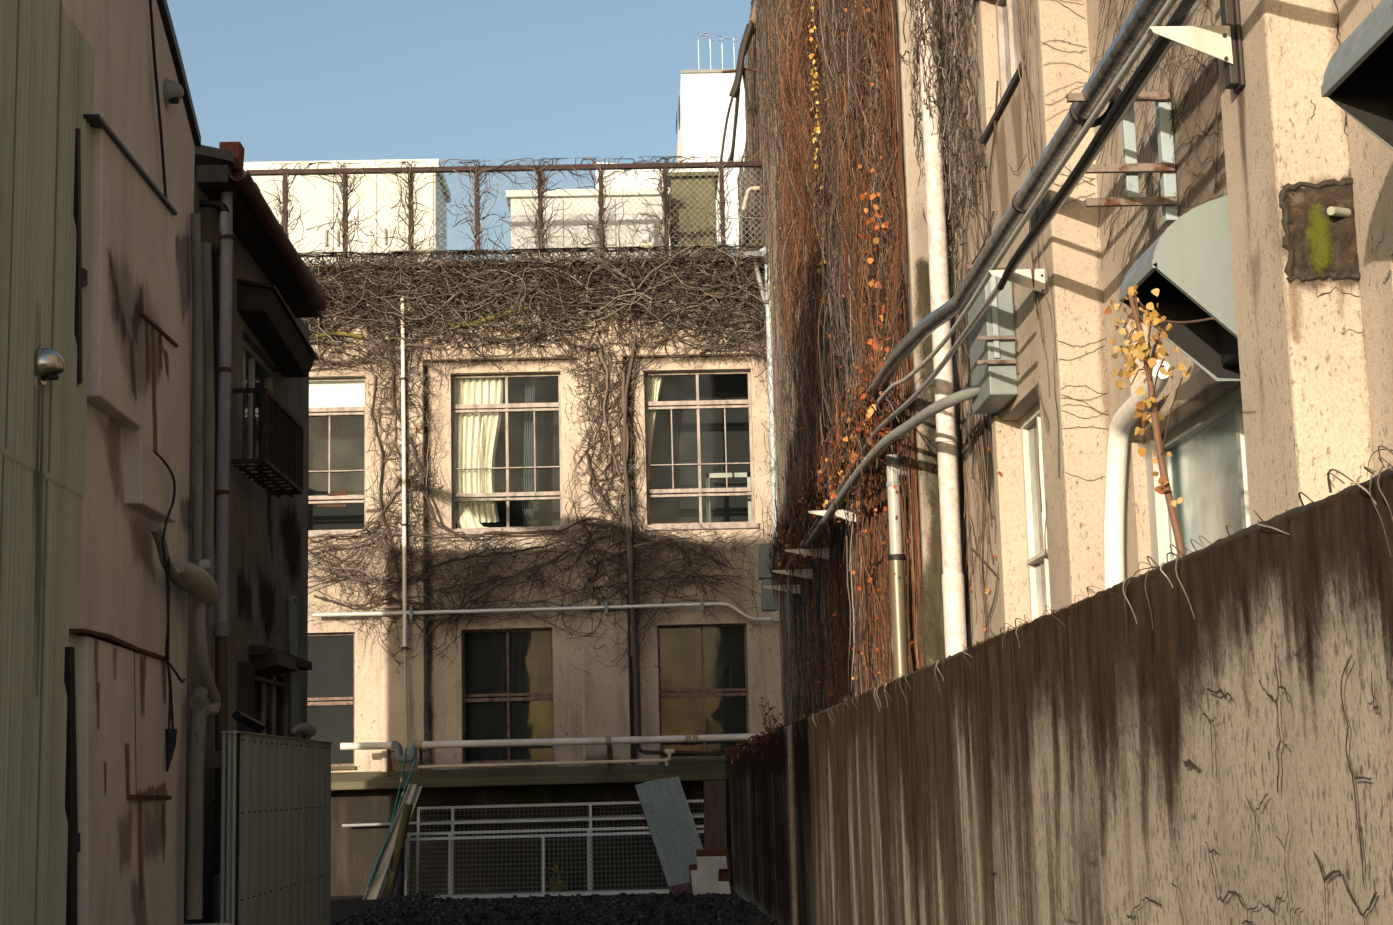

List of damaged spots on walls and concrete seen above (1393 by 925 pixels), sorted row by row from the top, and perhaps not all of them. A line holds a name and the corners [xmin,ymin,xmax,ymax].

leakage [1288,179,1347,215]
leakage [110,255,162,395]
leakage [1280,224,1360,339]
leakage [792,261,1393,925]
leakage [140,657,166,713]
rust [125,743,167,900]
crack [1183,646,1380,925]